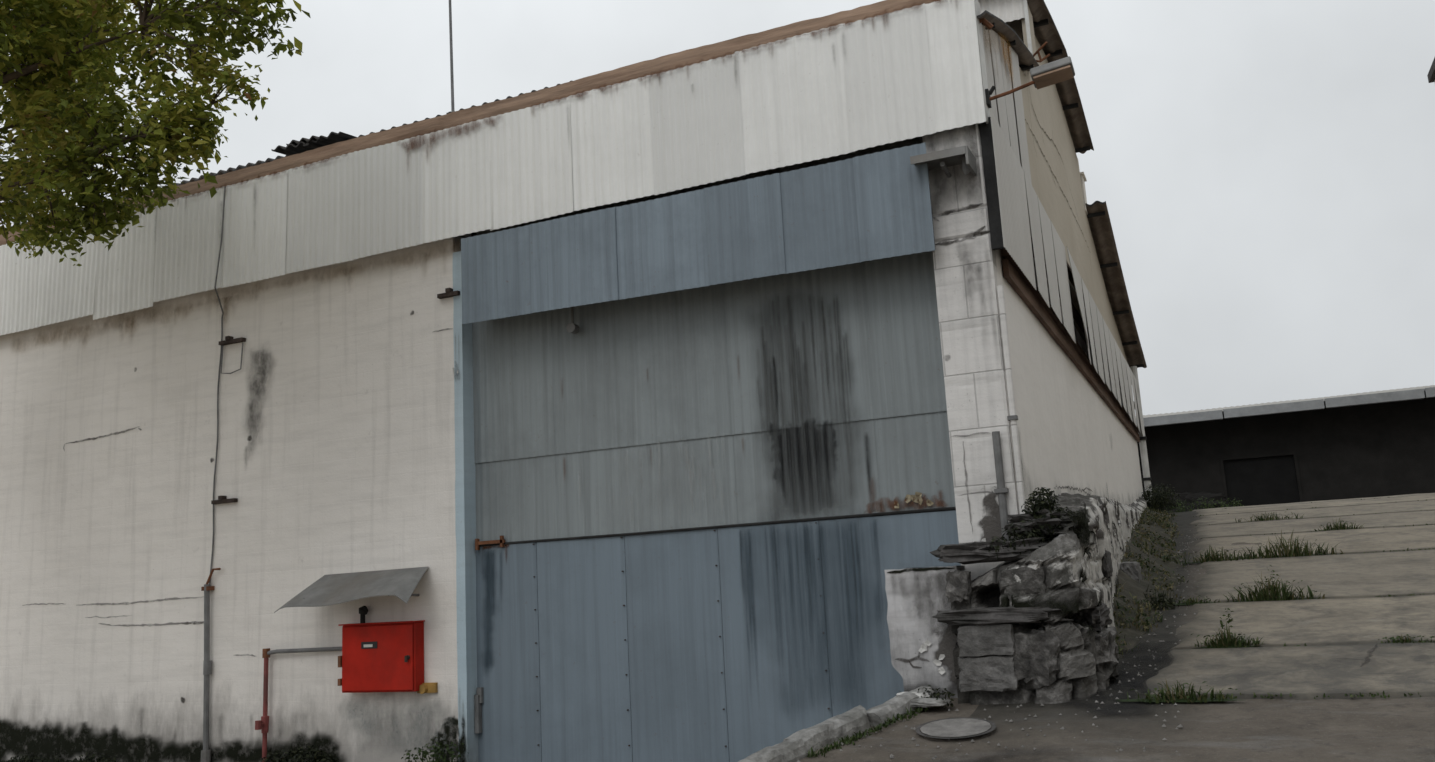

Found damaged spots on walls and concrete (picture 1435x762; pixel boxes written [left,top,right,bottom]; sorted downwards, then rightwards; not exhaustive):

crack [1025,89,1091,253]
crack [63,426,141,449]
leakage [762,317,836,508]
crack [22,597,204,626]
leakage [484,553,493,667]